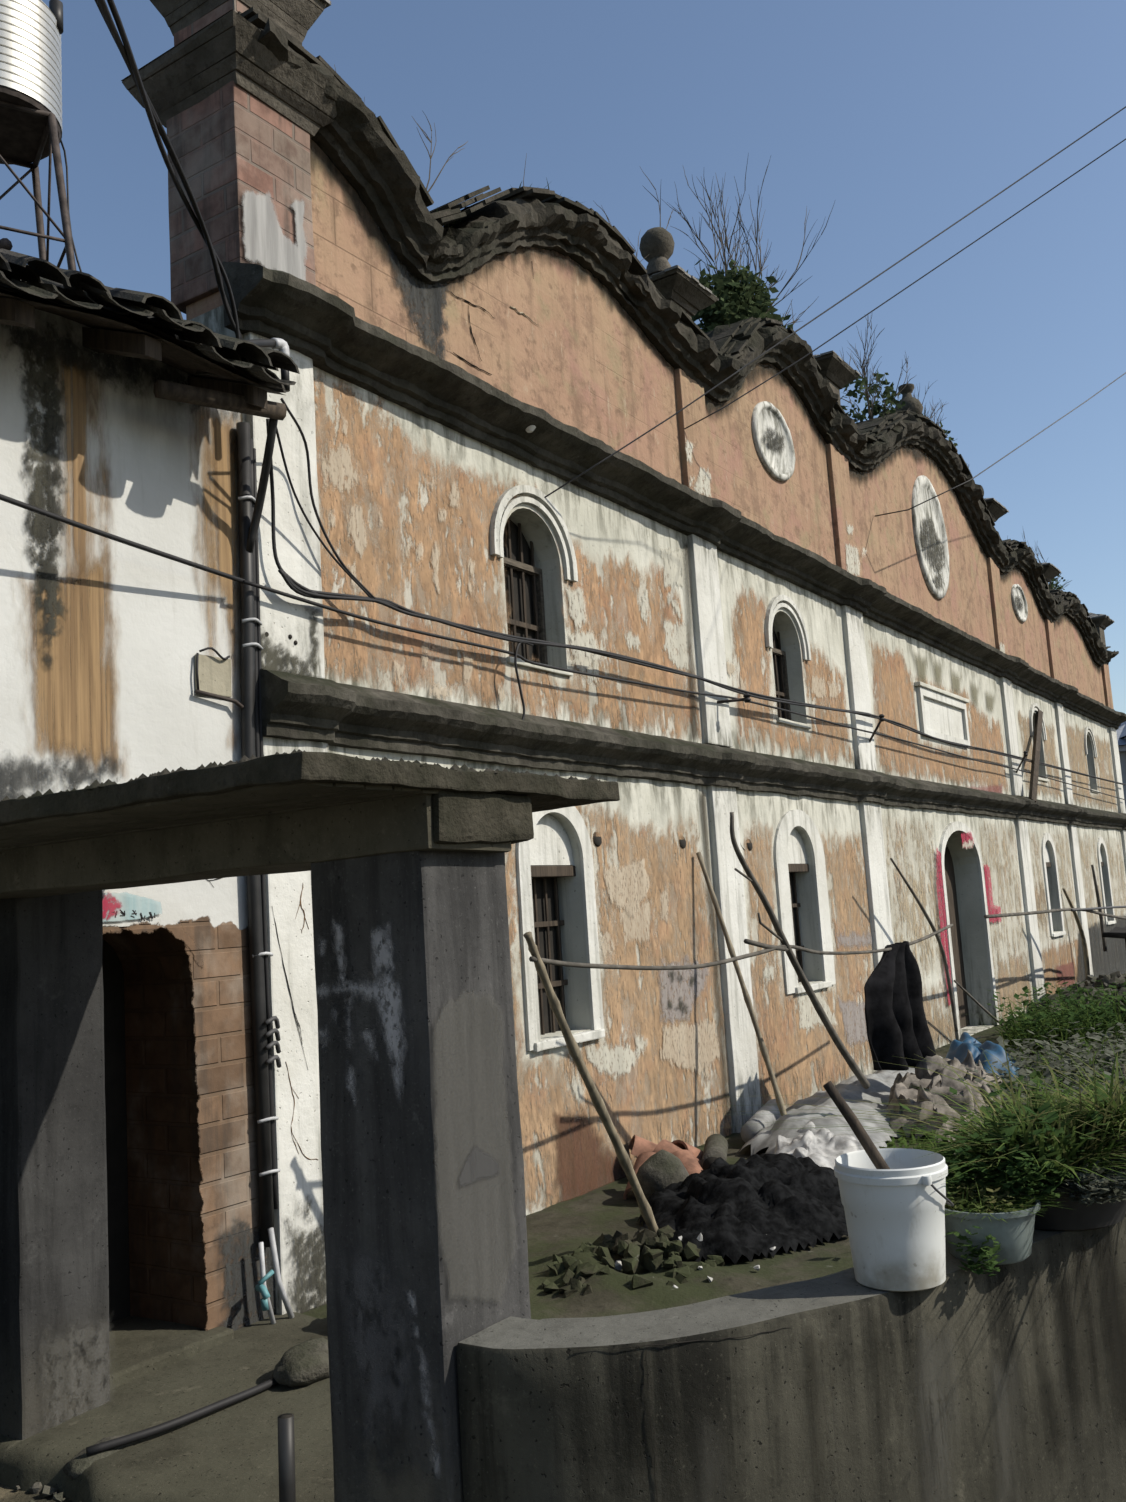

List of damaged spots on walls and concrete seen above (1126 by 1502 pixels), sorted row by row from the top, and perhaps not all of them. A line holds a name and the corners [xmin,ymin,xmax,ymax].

crack [447,264,539,375]
mould [6,323,197,667]
peeling [685,438,711,497]
rust [31,359,118,768]
peeling [567,587,602,682]
peeling [625,549,690,669]
water stain [0,757,118,801]
crack [272,888,318,1160]
peeling [586,956,720,1079]
peeling [798,990,868,1045]
flaking render [103,916,269,1331]
mould [219,1196,327,1331]